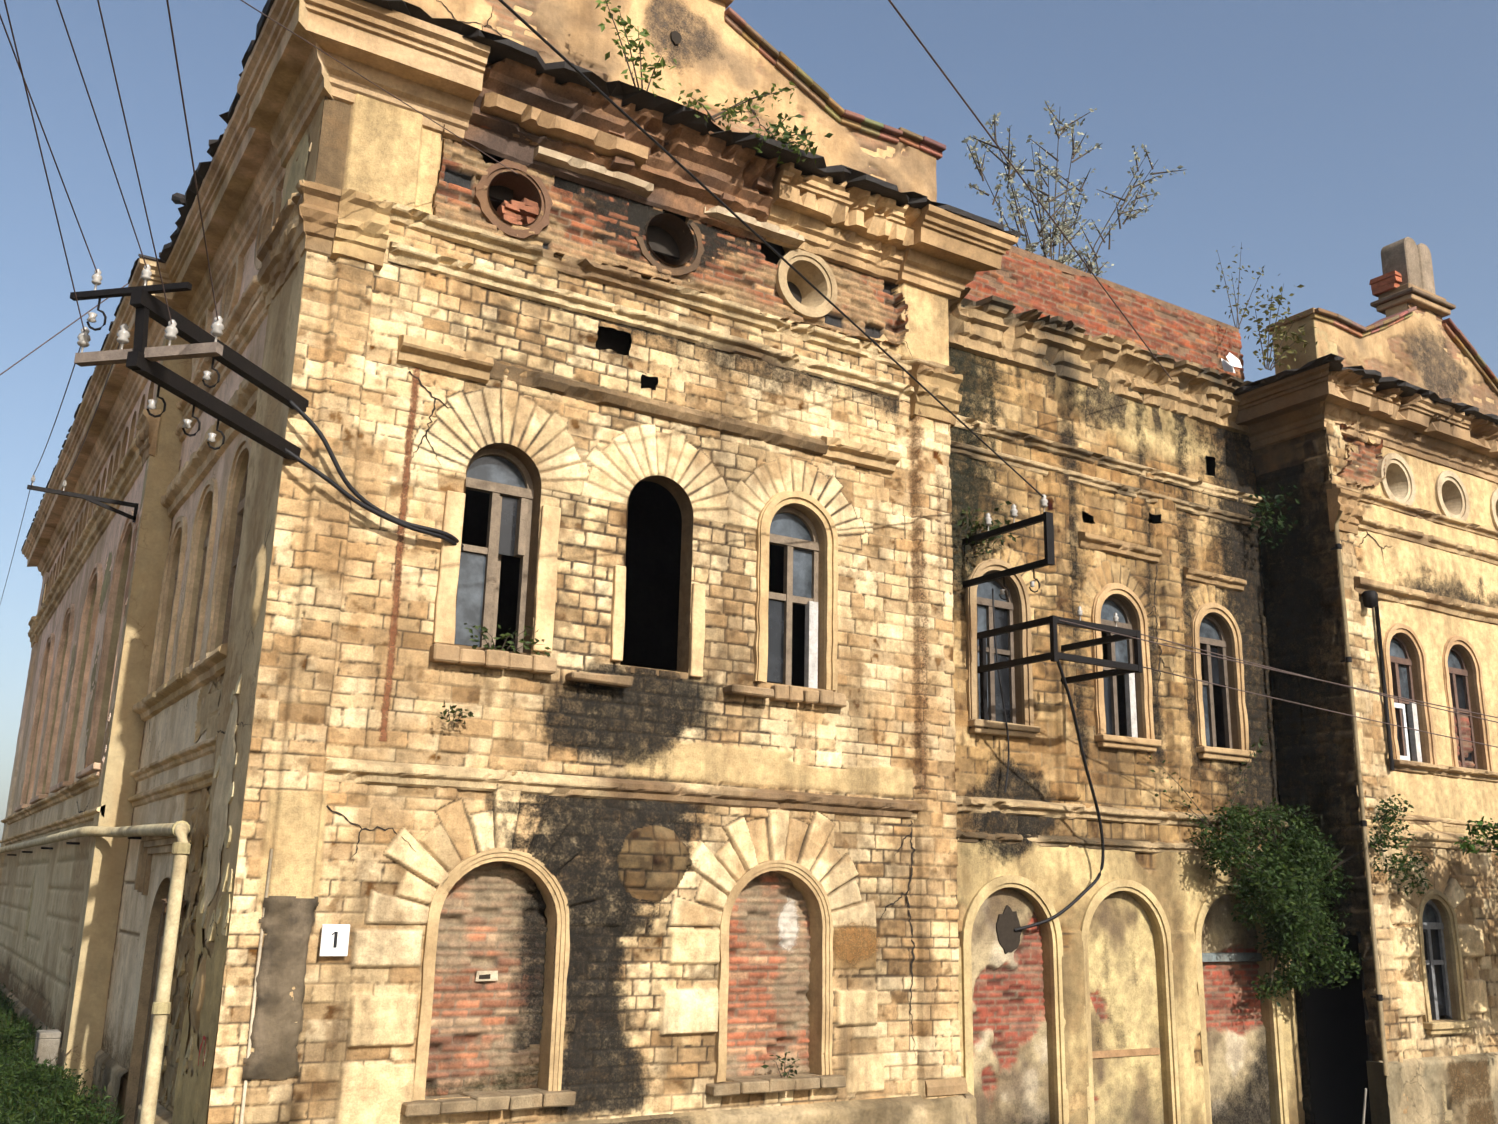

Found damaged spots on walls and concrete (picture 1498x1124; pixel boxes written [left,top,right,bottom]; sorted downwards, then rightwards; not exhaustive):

spalling [432,123,910,355]
peeling [99,513,139,614]
corrosion [379,367,420,742]
peeling [84,645,111,765]
damp [540,664,716,781]
peeling [158,673,242,1124]
damp [488,784,704,1124]